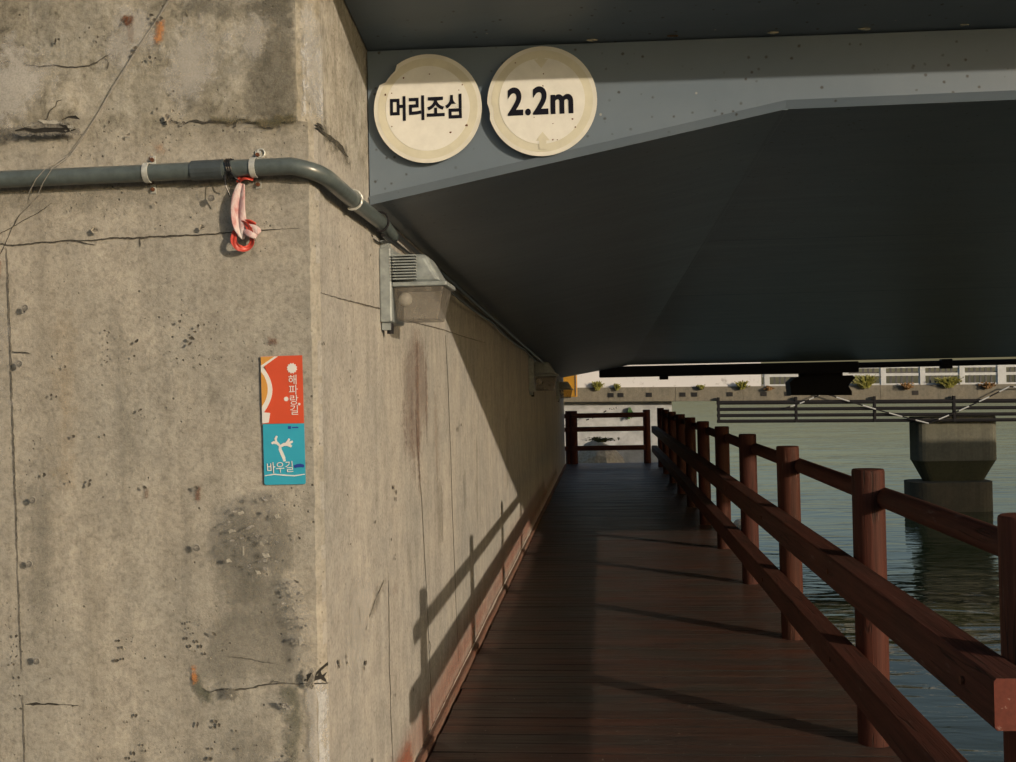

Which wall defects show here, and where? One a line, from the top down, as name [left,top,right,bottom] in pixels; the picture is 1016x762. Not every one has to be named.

crack [0,39,125,69]
spalling [0,115,80,140]
crack [0,195,232,671]
crack [202,656,305,693]